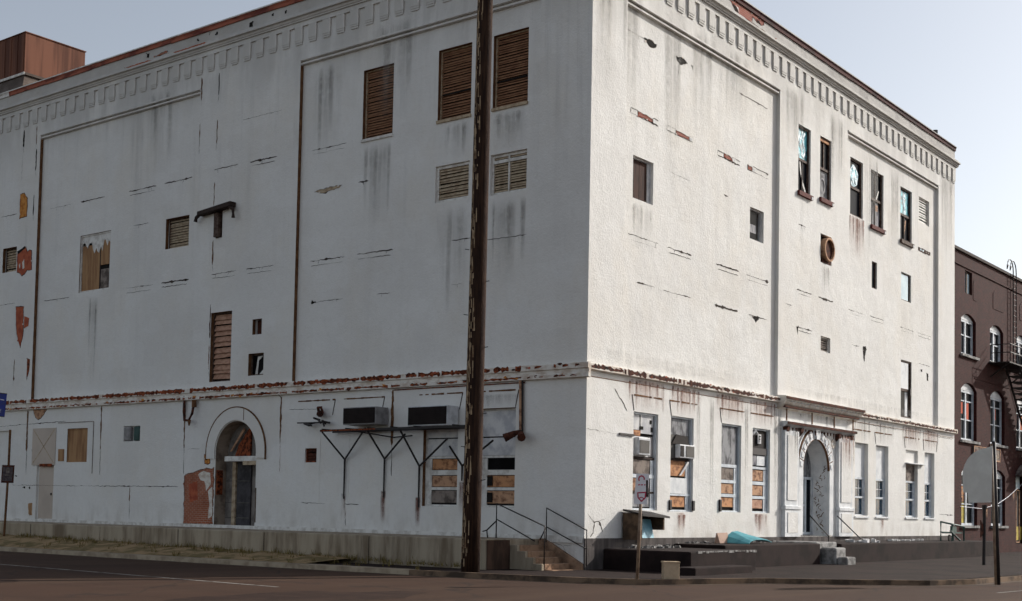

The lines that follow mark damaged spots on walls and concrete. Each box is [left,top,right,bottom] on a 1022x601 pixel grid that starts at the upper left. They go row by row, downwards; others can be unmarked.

peeling [730,0,764,27]
spalling [631,107,692,142]
spalling [717,150,768,179]
peeling [183,454,215,524]